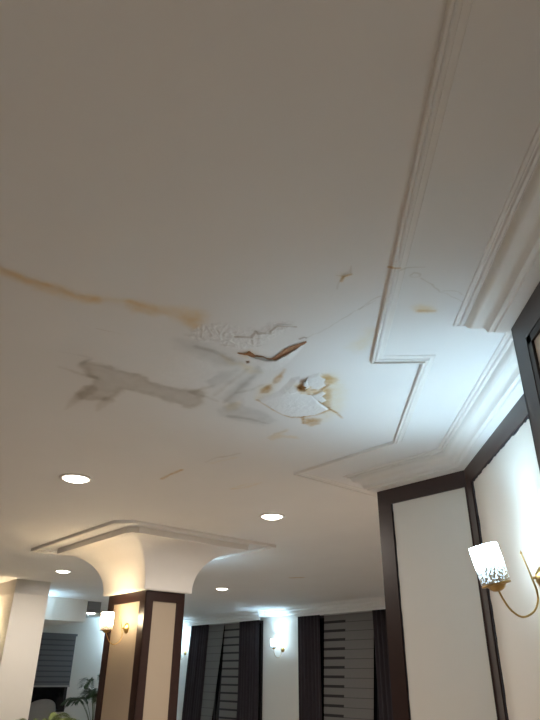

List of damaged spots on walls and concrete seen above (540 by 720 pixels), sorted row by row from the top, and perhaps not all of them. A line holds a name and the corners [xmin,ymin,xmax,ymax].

peeling [237,341,307,363]
peeling [258,372,328,417]